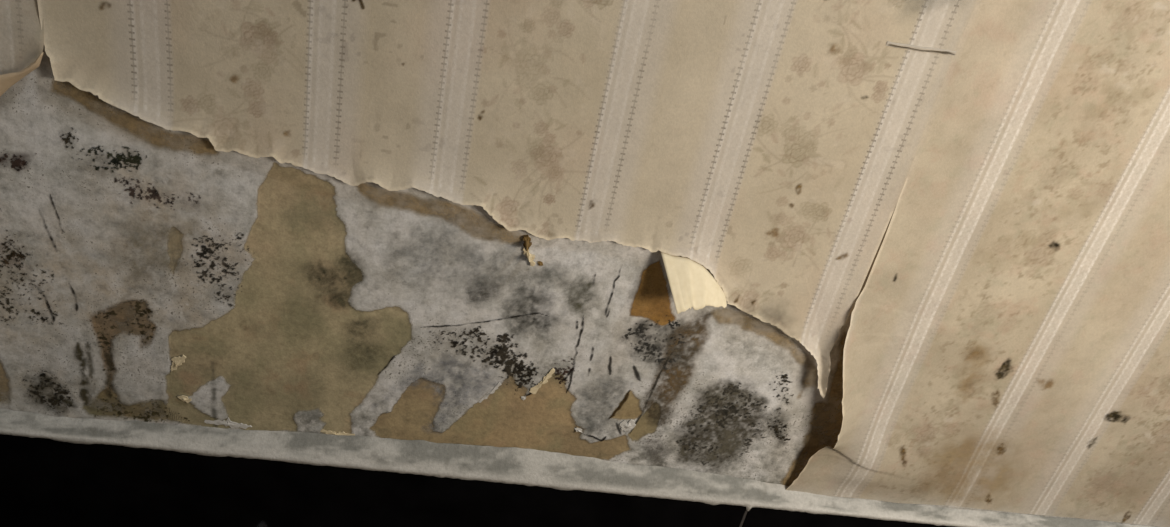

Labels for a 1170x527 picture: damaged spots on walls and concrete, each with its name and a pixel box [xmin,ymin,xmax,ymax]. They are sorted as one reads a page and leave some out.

mould [62,128,201,208]
mould [0,230,62,326]
mould [164,234,249,306]
peeling [83,162,412,436]
peeling [0,363,10,402]
mould [23,343,114,412]
mould [414,288,575,407]
peeling [370,368,661,460]
water stain [622,313,711,424]
water stain [676,374,794,467]
water stain [994,360,1011,405]
water stain [1106,411,1127,422]